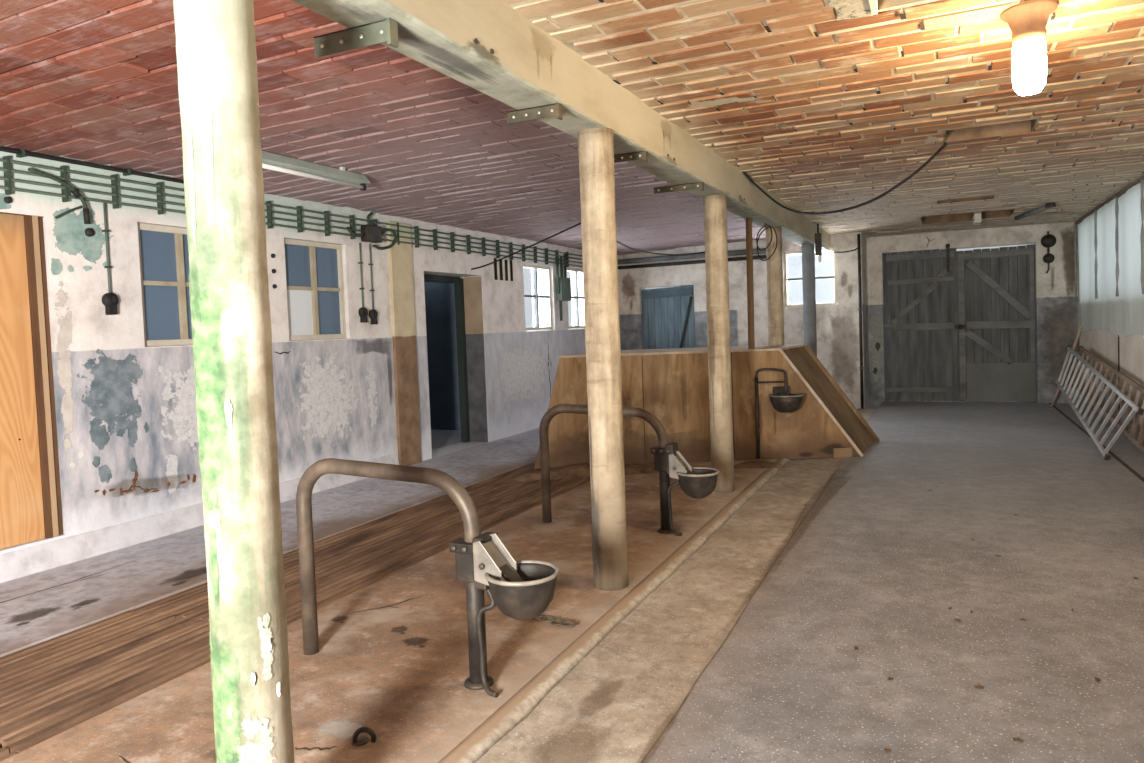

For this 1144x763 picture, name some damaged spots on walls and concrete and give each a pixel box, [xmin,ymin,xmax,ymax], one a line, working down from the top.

peeling [51,208,196,496]
peeling [250,613,280,697]
peeling [228,705,276,763]